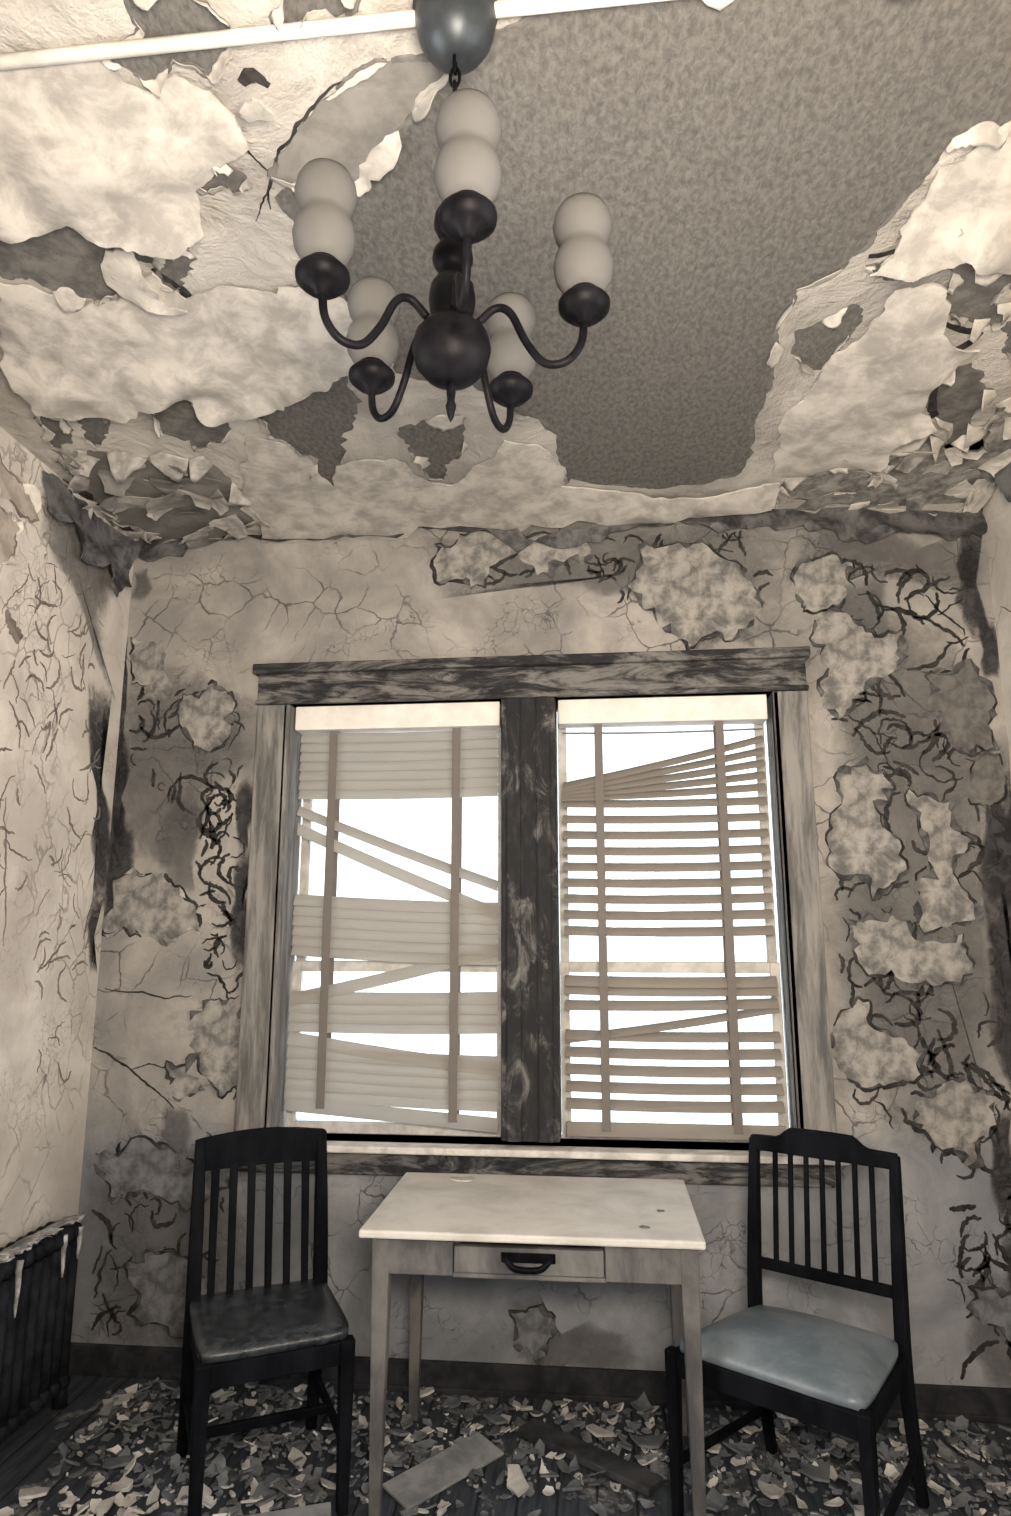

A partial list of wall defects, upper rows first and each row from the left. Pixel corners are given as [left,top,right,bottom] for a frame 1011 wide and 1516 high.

peeling [0,0,1011,650]
peeling [129,637,235,754]
peeling [790,551,909,719]
crack [0,554,249,1163]
peeling [101,868,202,947]
peeling [164,995,241,1102]
peeling [830,996,996,1169]
peeling [825,658,1010,989]
crack [831,558,1011,1380]
peeling [93,1135,230,1218]
crack [91,1192,219,1337]